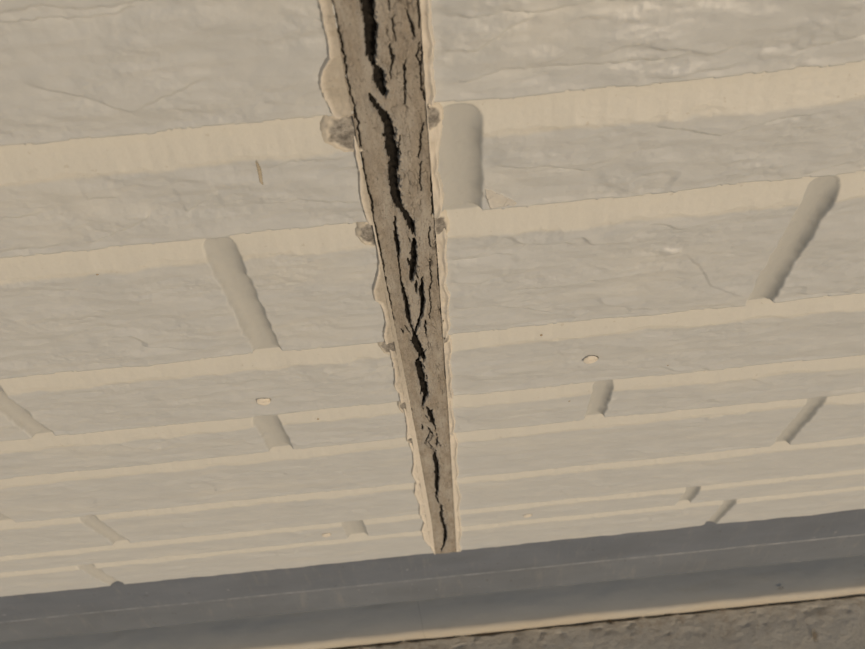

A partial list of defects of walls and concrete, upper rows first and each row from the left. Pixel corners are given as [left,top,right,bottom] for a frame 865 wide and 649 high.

crack [332,0,447,549]